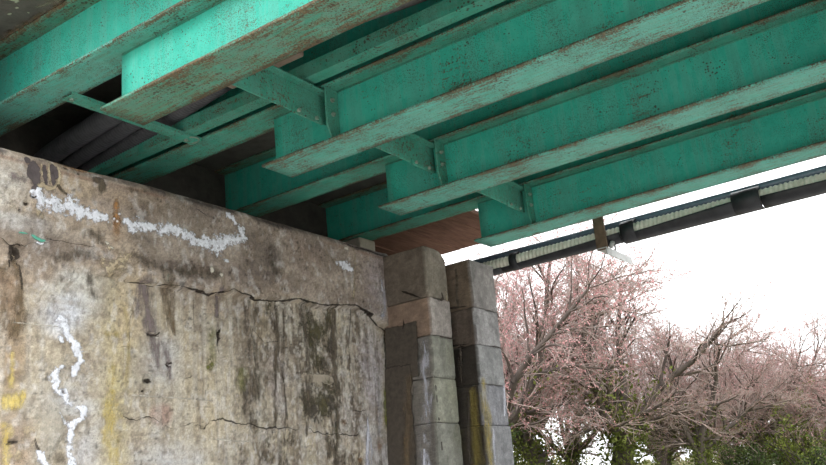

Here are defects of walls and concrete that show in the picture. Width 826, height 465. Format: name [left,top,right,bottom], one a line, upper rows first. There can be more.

leakage [30,187,109,244]
leakage [123,212,248,262]
leakage [135,277,171,379]
leakage [132,253,223,336]
crack [121,332,358,460]
crack [127,282,405,372]
leakage [240,304,295,465]
leakage [300,302,313,437]
leakage [325,303,429,465]